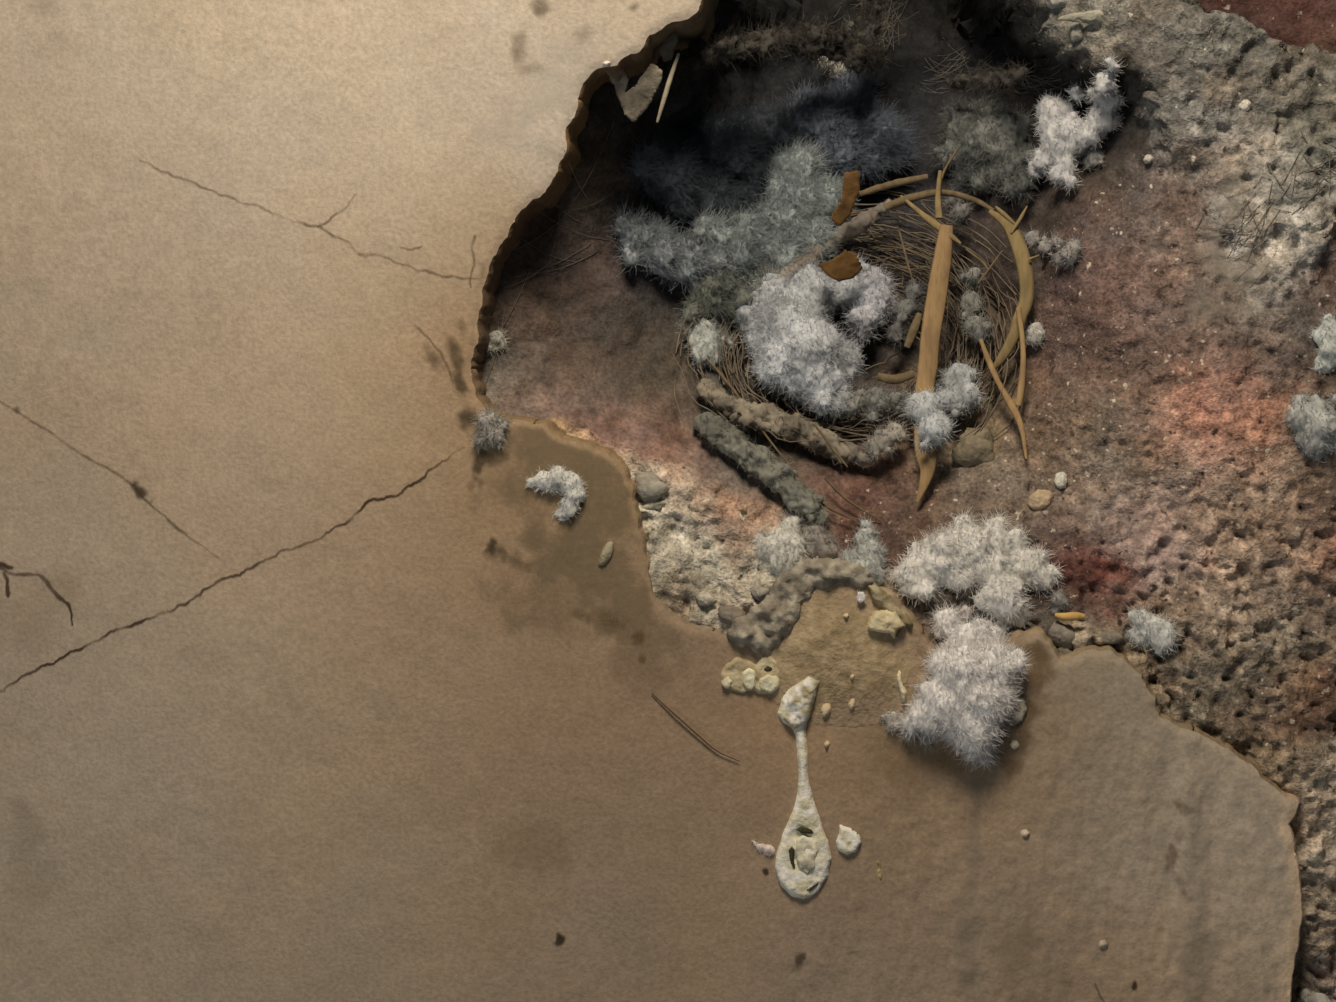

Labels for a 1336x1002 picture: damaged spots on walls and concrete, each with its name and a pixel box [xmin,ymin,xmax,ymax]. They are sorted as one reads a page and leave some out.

crack [391,235,476,285]
water stain [451,343,467,391]
crack [83,455,196,542]
crack [325,460,446,534]
water stain [474,450,487,472]
water stain [501,427,648,642]
spalling [471,0,1336,1002]
crack [0,549,285,684]